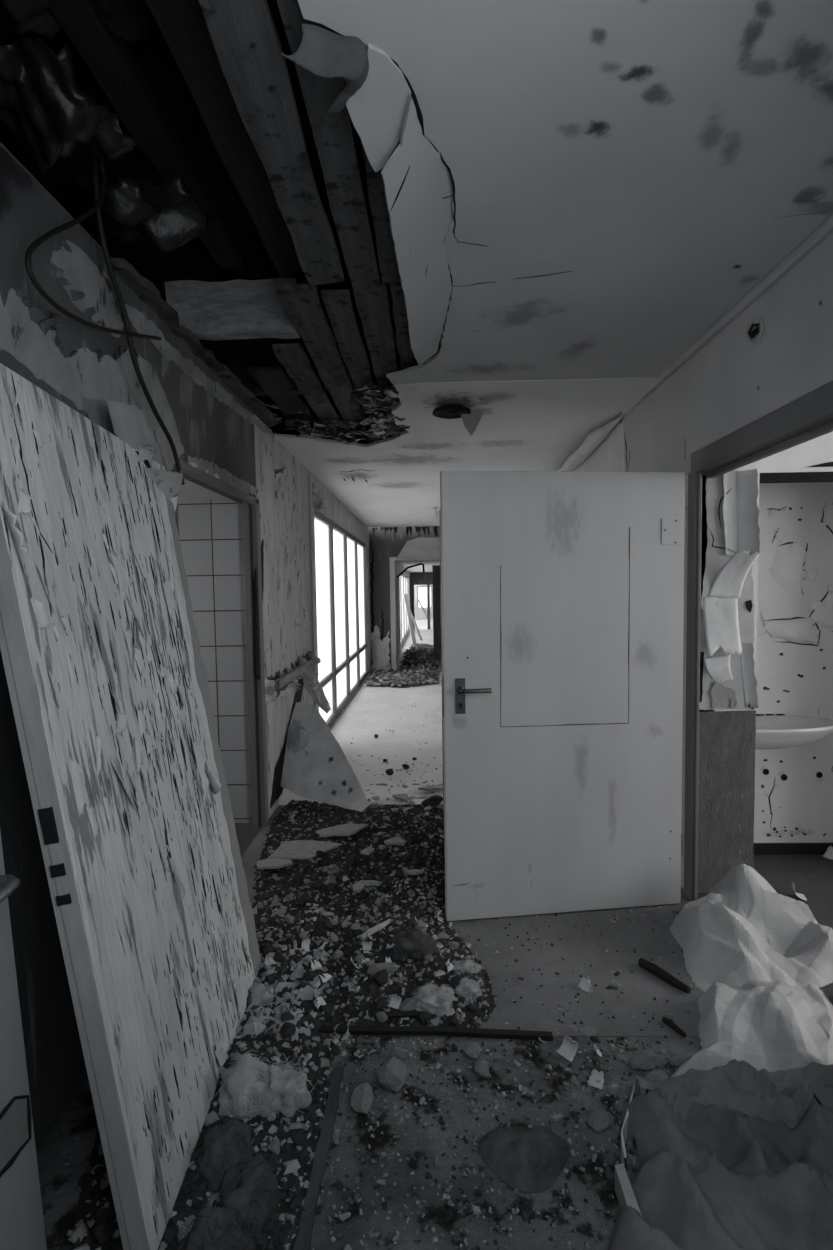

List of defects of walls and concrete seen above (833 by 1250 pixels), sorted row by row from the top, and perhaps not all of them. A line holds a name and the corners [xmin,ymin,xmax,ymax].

water stain [623,66,652,80]
water stain [589,122,609,134]
peeling [0,239,328,1206]